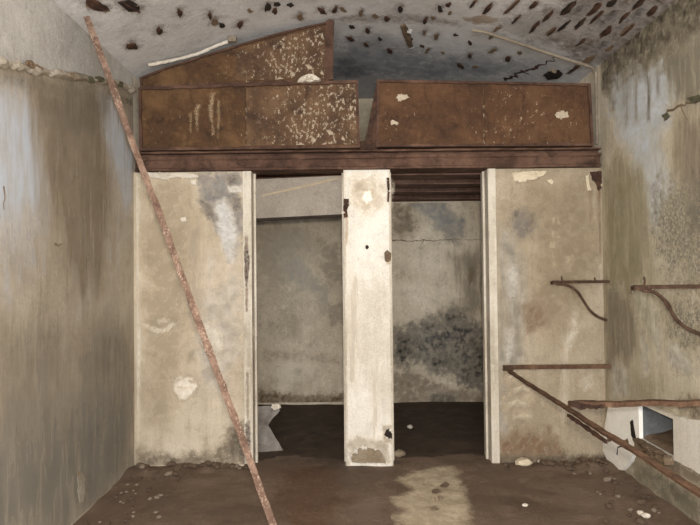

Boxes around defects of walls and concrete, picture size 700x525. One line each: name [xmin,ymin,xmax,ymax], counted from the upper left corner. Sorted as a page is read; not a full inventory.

spalling [85,0,145,13]
peeling [400,2,452,53]
spalling [529,0,619,36]
crack [503,57,556,81]
water stain [0,75,139,299]
water stain [197,171,243,264]
spalling [512,170,554,184]
water stain [601,0,700,399]
crack [392,238,481,251]
water stain [0,186,245,525]
water stain [393,372,484,403]
spalling [347,426,393,465]